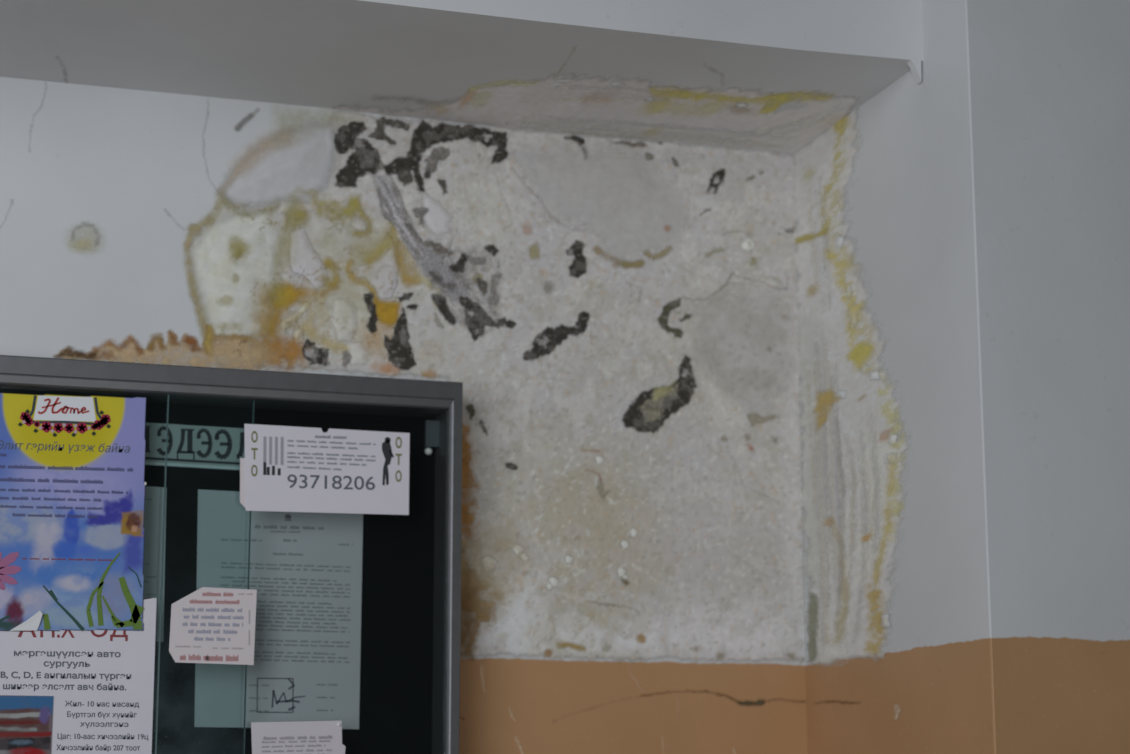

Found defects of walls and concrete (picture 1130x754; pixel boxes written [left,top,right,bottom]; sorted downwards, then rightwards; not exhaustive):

leakage [650,89,826,113]
leakage [615,141,662,160]
leakage [707,169,725,194]
leakage [231,241,245,259]
leakage [779,220,829,243]
leakage [185,220,208,339]
leakage [658,298,692,338]
leakage [827,252,873,368]
peeling [189,74,909,665]
leakage [622,356,697,433]
leakage [867,563,882,653]
crack [706,691,764,705]